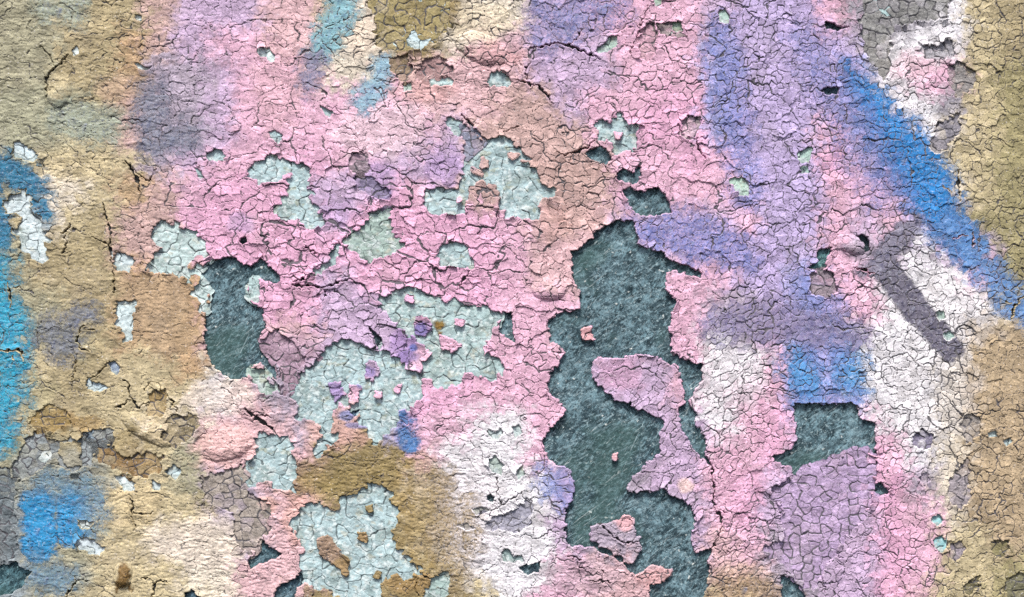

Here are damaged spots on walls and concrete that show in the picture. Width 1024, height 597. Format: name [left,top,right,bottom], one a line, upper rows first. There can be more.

crack [518,32,600,103]
crack [125,161,157,193]
peeling [236,131,333,232]
peeling [423,116,559,226]
peeling [3,188,57,264]
crack [292,247,347,297]
spalling [537,112,712,597]
crack [245,407,274,430]
peeling [110,219,533,597]
crack [710,463,725,547]
peeling [763,402,896,597]
crack [567,523,640,584]